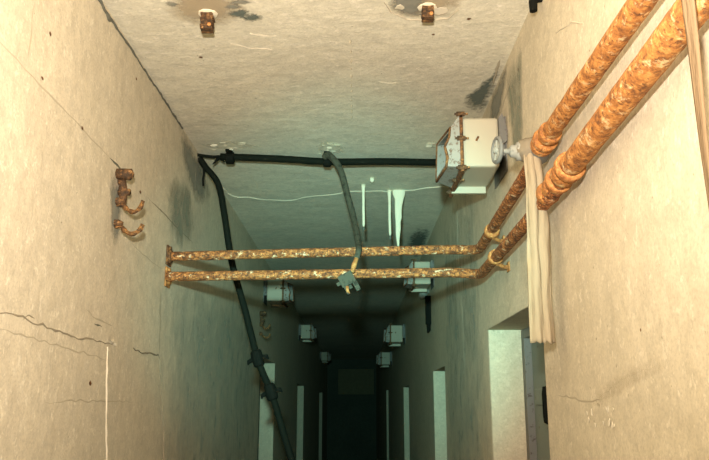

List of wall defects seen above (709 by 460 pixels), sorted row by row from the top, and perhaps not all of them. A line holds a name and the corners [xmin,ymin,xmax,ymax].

leakage [467,60,521,145]
leakage [172,143,206,239]
crack [0,302,112,360]
crack [133,348,164,460]